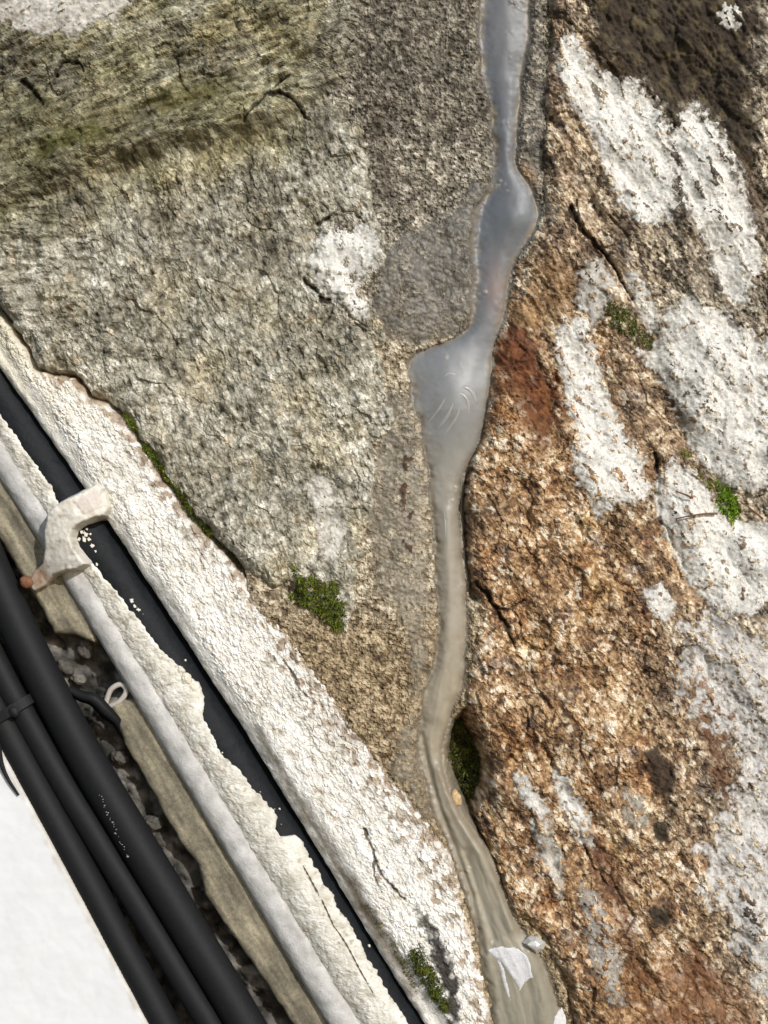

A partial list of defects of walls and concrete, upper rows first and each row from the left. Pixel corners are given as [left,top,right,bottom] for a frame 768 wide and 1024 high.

crack [363,828,405,899]